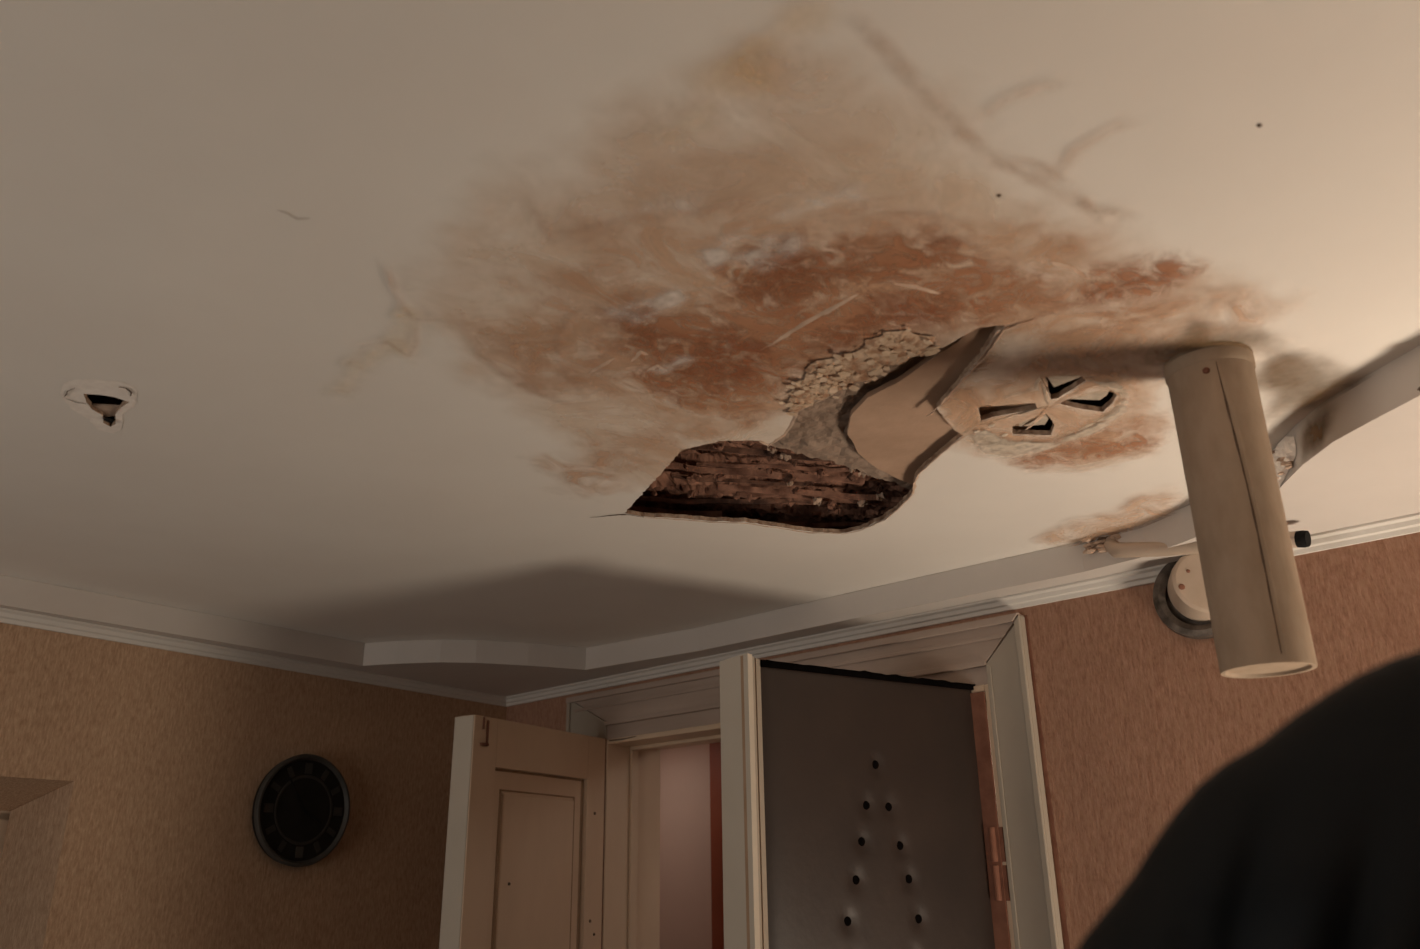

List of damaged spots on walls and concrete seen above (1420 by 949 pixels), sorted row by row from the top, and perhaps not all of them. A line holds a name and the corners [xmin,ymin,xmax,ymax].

leakage [494,188,1186,466]
leakage [1171,306,1256,355]
spalling [60,379,138,434]
peeling [778,328,941,416]
leakage [1266,358,1326,407]
leakage [1303,416,1327,450]